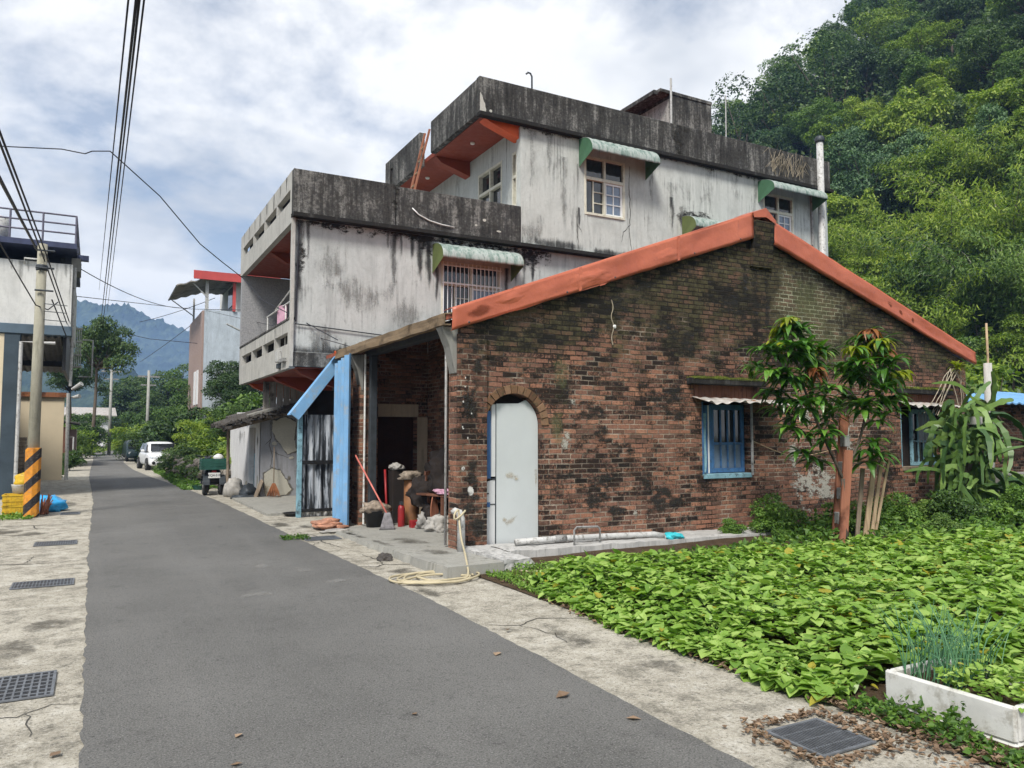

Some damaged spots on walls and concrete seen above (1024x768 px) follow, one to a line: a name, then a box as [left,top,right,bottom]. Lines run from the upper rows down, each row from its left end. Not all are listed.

damp [296,187,575,296]
crack [621,167,632,251]
damp [670,197,710,224]
damp [564,472,690,524]
peeling [788,443,835,511]